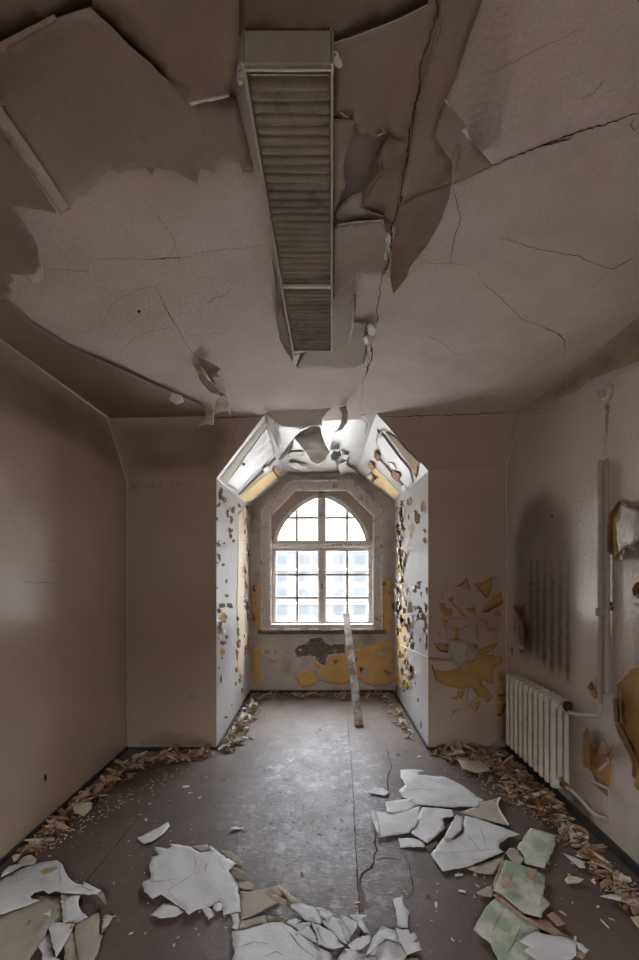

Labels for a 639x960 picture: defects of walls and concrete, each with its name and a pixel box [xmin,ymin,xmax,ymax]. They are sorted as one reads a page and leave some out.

peeling [0,0,492,427]
crack [360,3,639,409]
peeling [216,406,356,700]
crack [358,832,414,912]
peeling [294,414,528,738]
peeling [583,666,639,797]